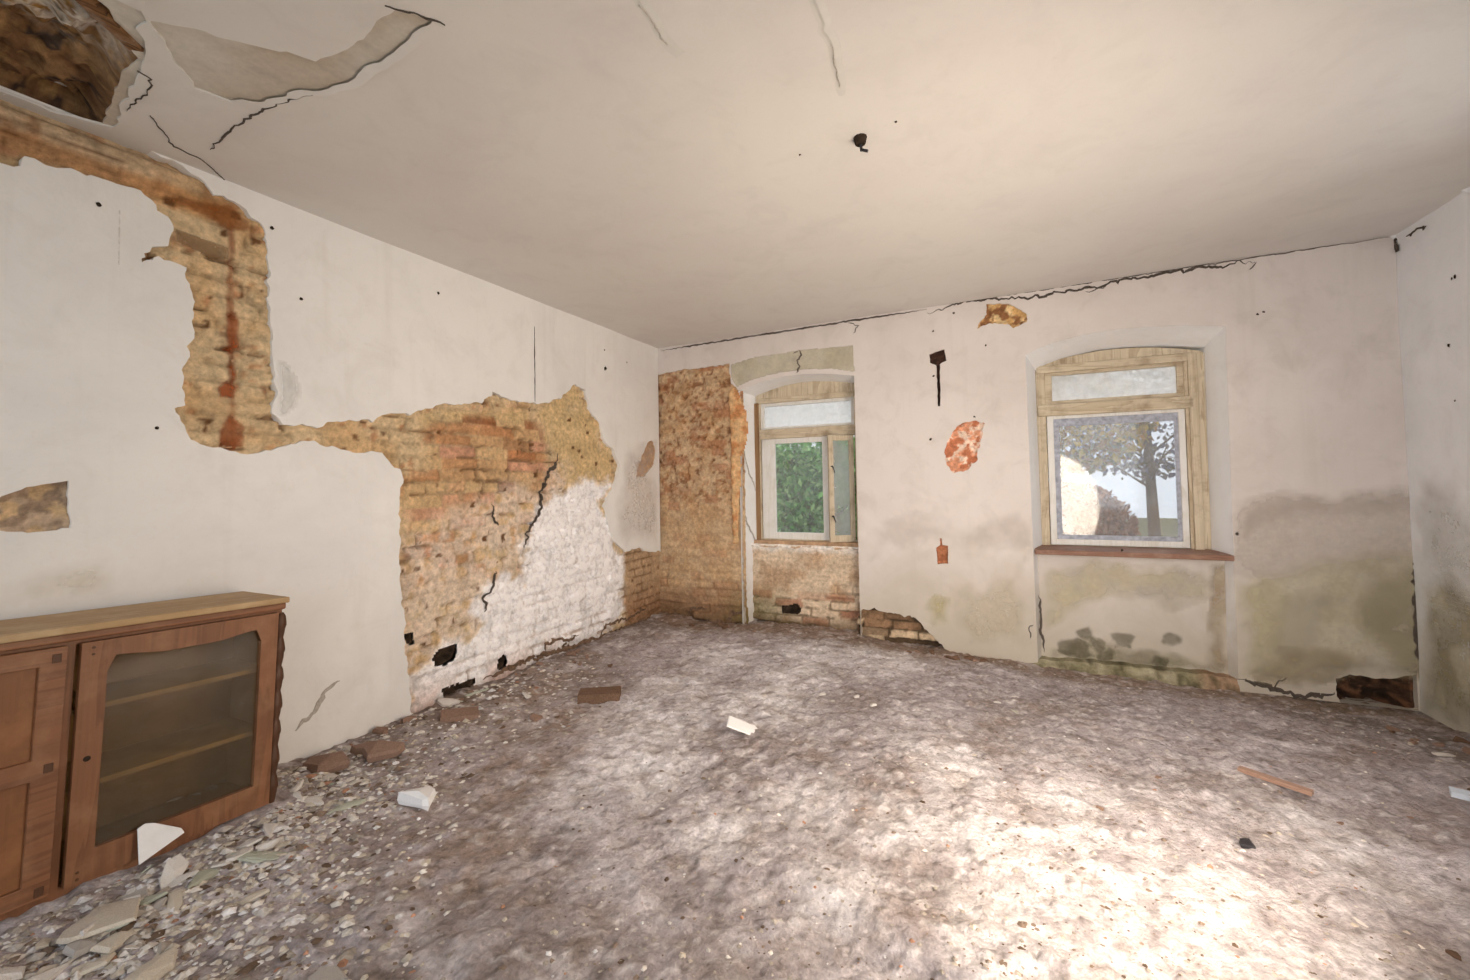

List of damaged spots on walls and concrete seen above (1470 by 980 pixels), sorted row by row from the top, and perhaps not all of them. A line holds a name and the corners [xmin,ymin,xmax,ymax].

crack [633,0,685,58]
crack [808,0,846,96]
spalling [977,304,1027,329]
crack [663,226,1426,372]
flaking render [0,0,860,713]
spalling [944,421,985,473]
leakage [1212,566,1226,625]
leakage [1240,500,1470,712]
peeling [295,681,339,731]
crack [1239,677,1335,699]
spalling [1336,674,1414,710]